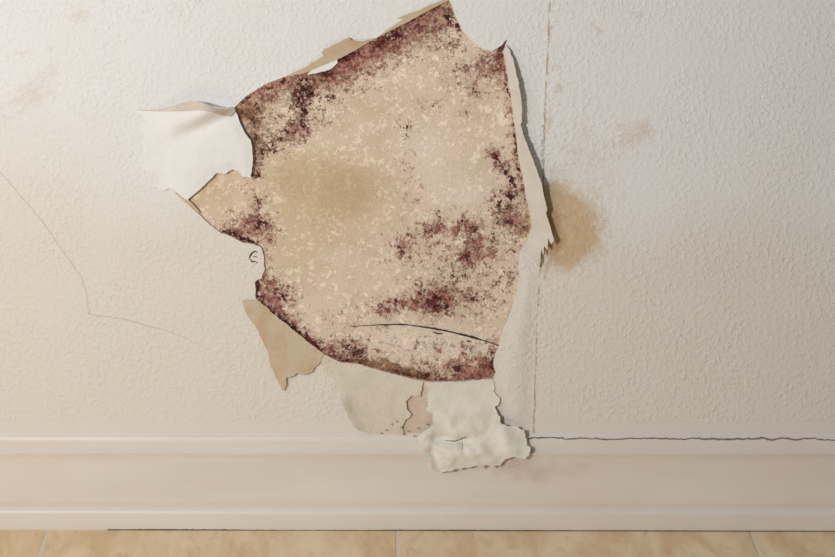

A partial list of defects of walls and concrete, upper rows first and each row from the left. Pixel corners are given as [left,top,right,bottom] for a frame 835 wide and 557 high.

damp [219,2,461,246]
peeling [137,0,554,473]
damp [256,258,498,381]
crack [352,324,498,346]
damp [368,48,532,331]
crack [540,0,551,188]
damp [544,190,597,267]
crack [528,264,835,441]
crack [107,526,835,534]